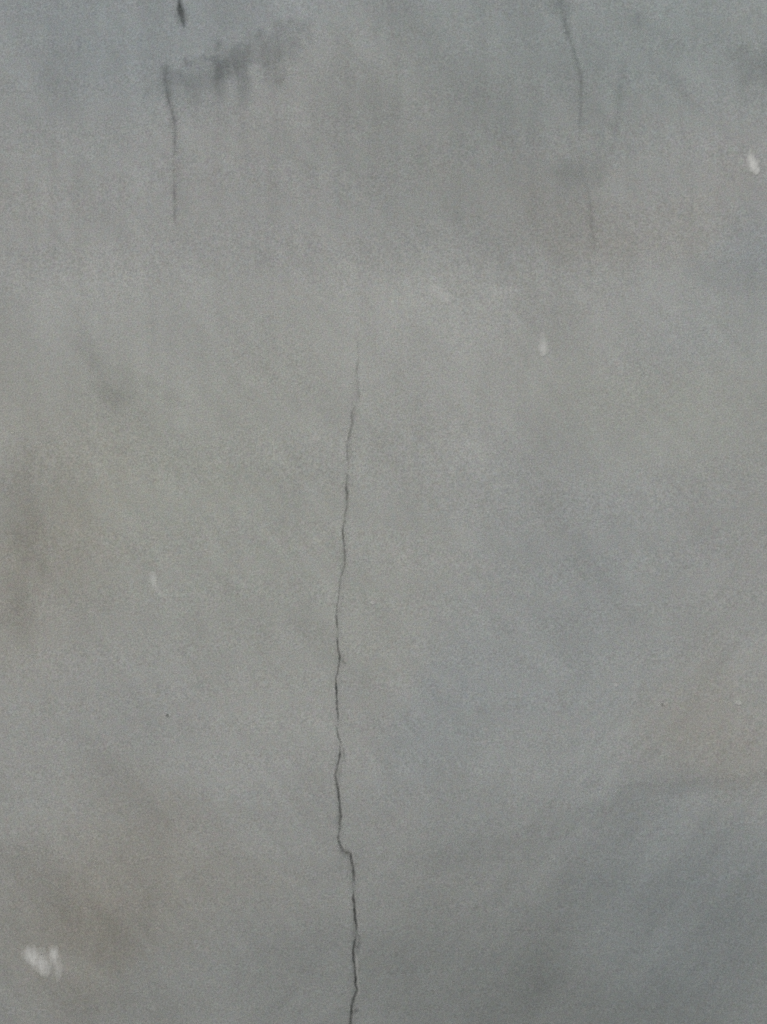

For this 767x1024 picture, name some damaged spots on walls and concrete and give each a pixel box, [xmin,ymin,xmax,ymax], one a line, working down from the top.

crack [334,752,342,820]
crack [344,850,358,1018]